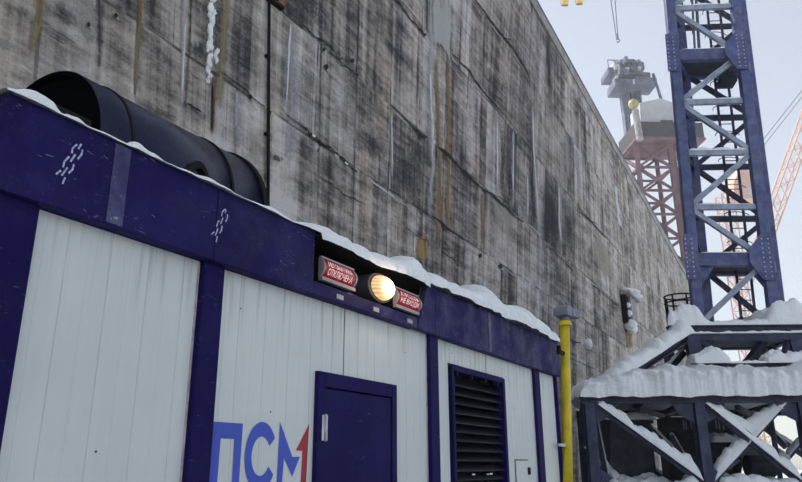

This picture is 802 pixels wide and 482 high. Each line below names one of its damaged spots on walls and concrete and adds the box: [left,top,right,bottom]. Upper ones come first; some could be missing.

water stain [285,24,301,153]
water stain [391,111,411,176]
rust [434,65,451,236]